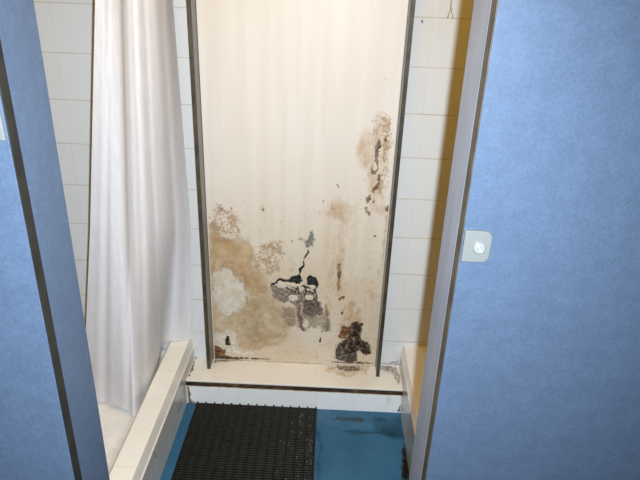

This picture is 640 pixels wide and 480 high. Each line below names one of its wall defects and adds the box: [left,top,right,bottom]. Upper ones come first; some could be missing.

leakage [379,117,391,193]
leakage [209,204,330,349]
spalling [270,274,319,303]
crack [298,232,315,278]